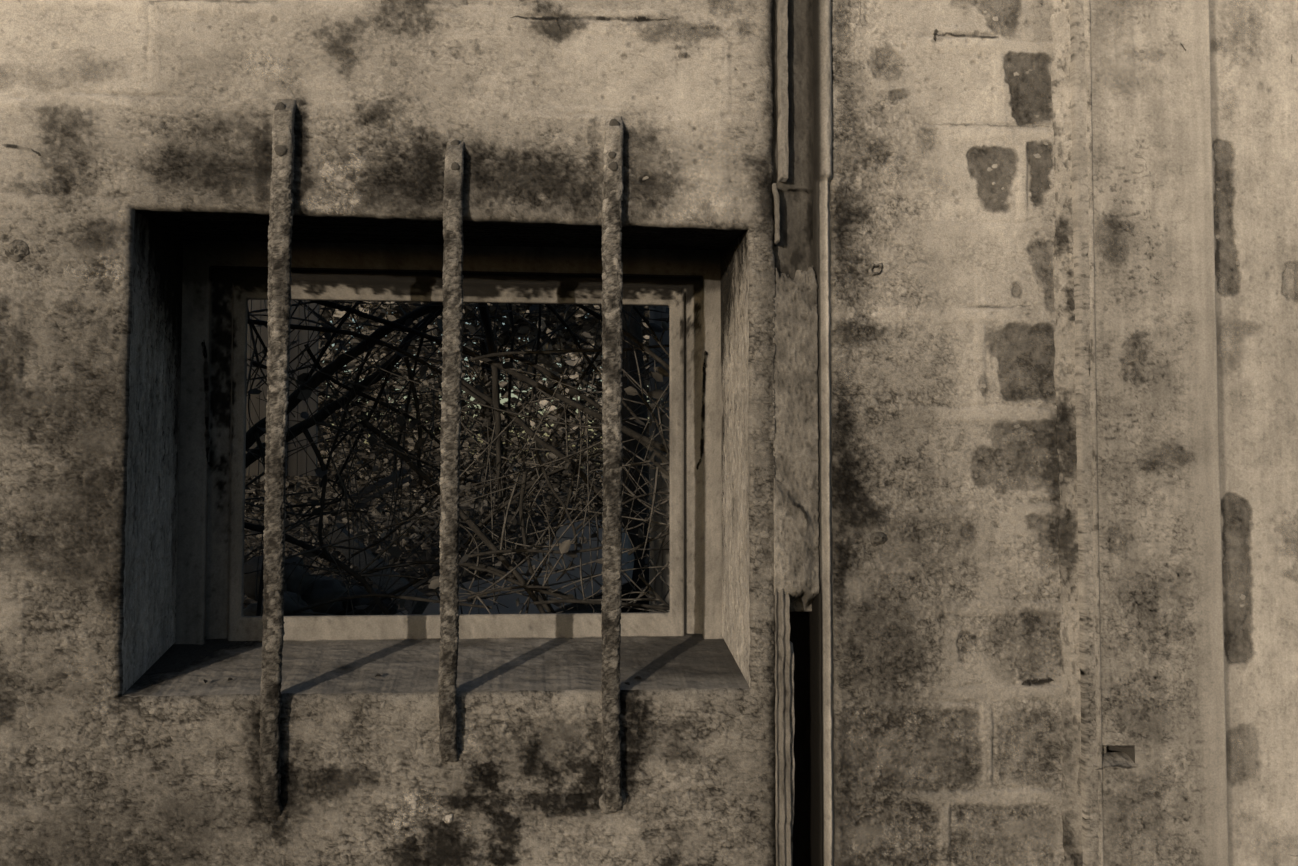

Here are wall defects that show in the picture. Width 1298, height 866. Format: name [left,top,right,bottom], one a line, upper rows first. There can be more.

leakage [15,107,91,197]
leakage [75,210,270,444]
leakage [209,266,268,507]
leakage [291,267,443,297]
leakage [291,98,445,245]
leakage [463,143,602,248]
leakage [462,271,603,299]
leakage [621,124,747,366]
leakage [1055,221,1068,250]
leakage [1065,272,1075,321]
leakage [832,361,917,684]
leakage [1051,405,1078,569]